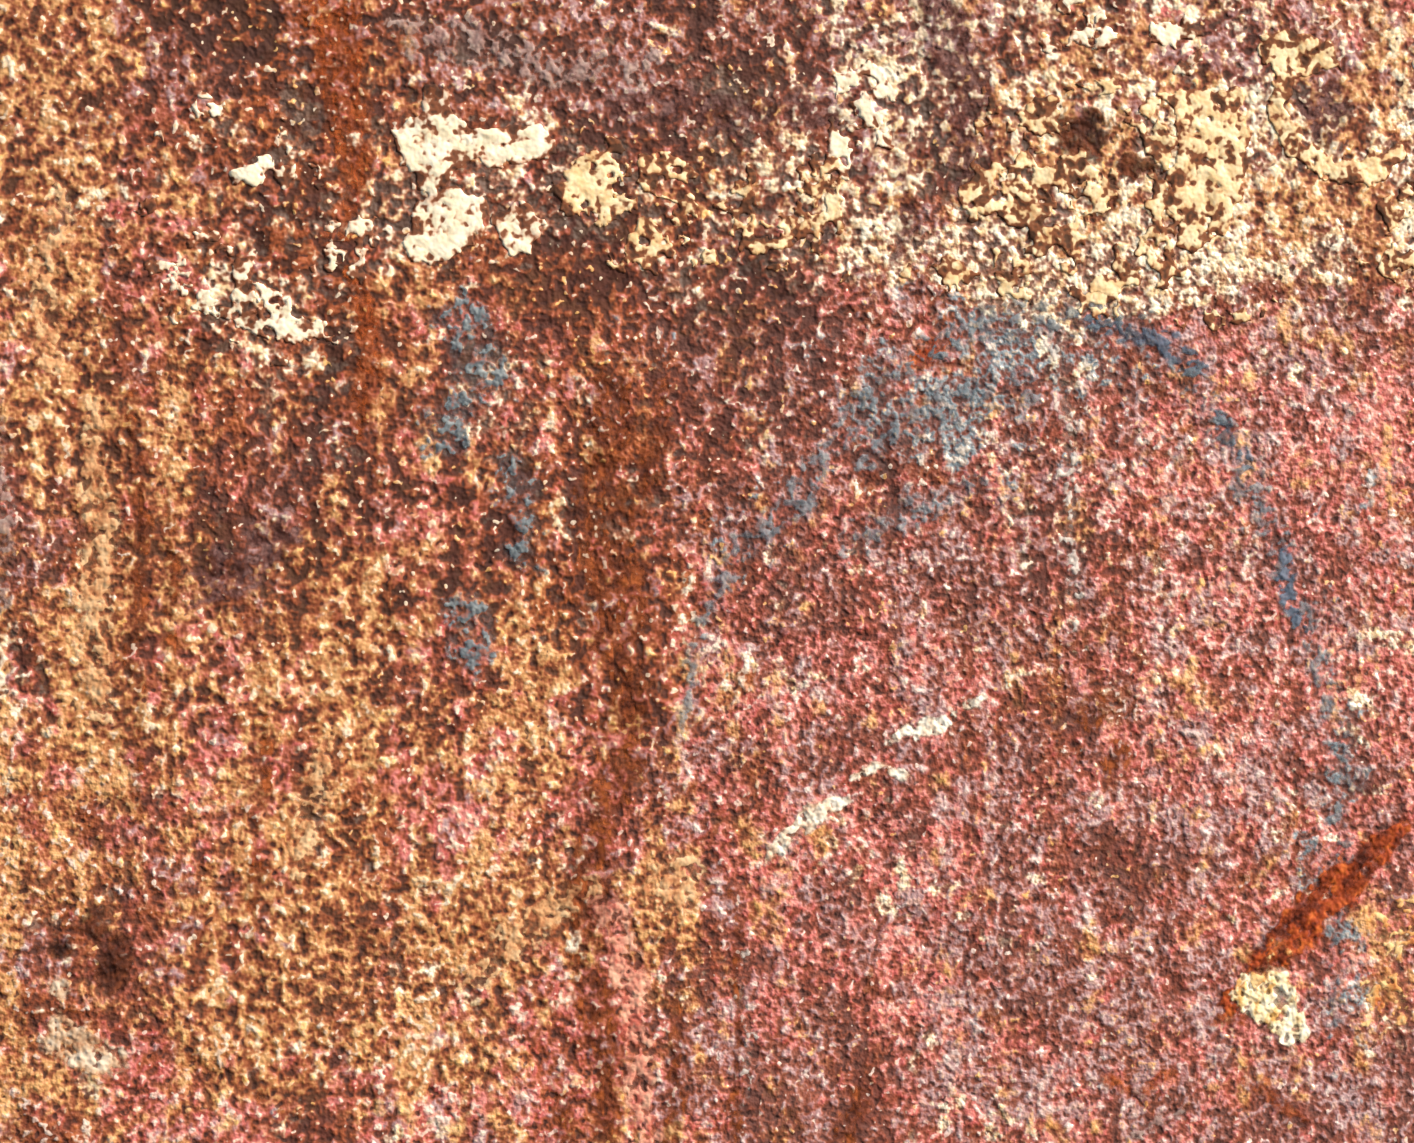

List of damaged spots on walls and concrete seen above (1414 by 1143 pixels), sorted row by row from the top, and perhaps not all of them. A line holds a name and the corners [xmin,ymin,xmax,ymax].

peeling [1038,0,1118,54]
peeling [390,84,557,266]
peeling [547,59,897,276]
peeling [899,15,1252,320]
peeling [1257,28,1414,293]
peeling [1203,295,1278,332]
rust [1218,816,1414,1033]